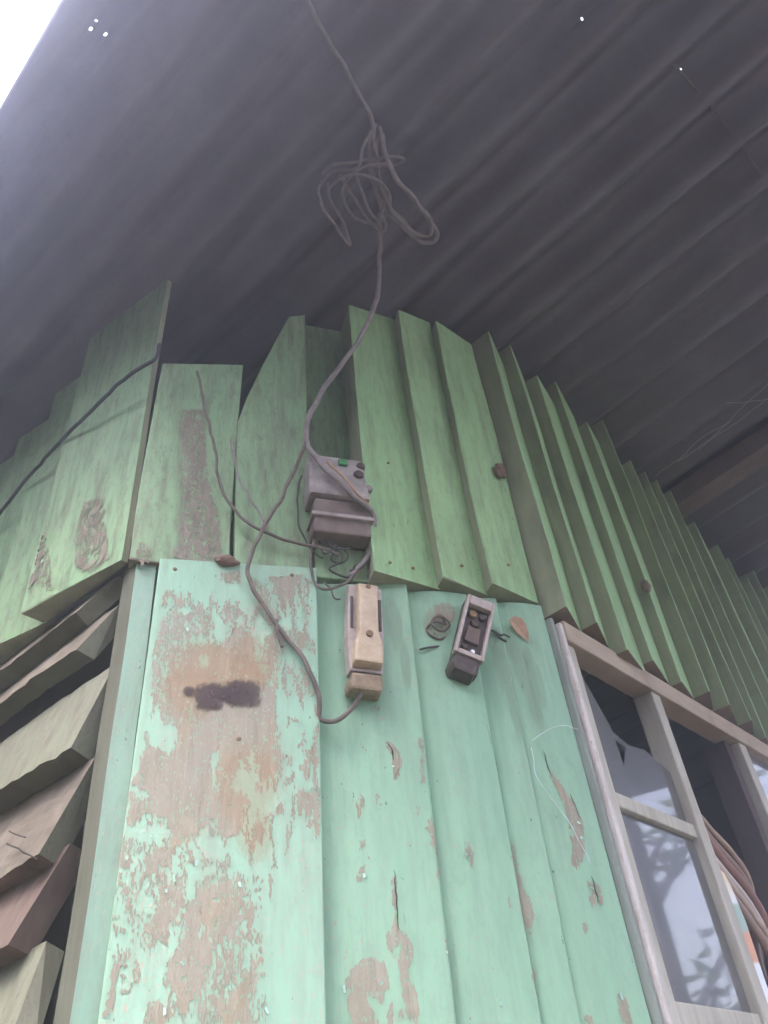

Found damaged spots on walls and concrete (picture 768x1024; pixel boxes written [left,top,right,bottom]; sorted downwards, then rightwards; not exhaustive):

peeling [170,408,223,562]
peeling [28,532,52,593]
peeling [74,497,109,573]
peeling [102,570,321,1024]
peeling [385,741,403,780]
peeling [549,772,585,870]
crack [394,872,406,930]
peeling [508,843,535,935]
peeling [342,876,420,1024]